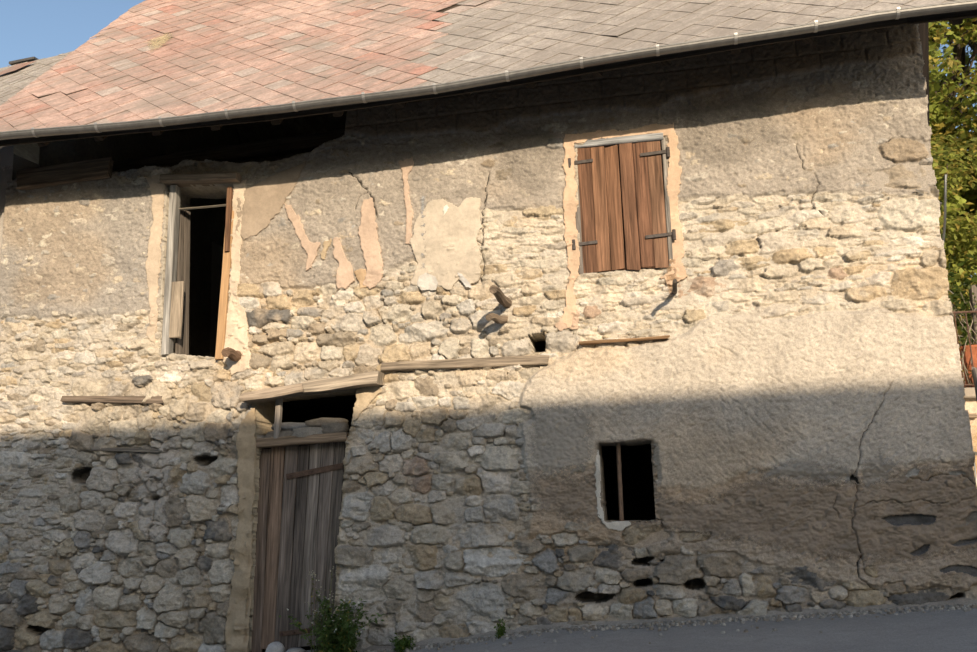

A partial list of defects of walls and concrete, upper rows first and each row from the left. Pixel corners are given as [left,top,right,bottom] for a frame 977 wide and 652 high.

peeling [143,175,166,344]
peeling [221,161,383,375]
peeling [399,157,483,291]
crack [477,176,489,283]
crack [834,390,971,590]